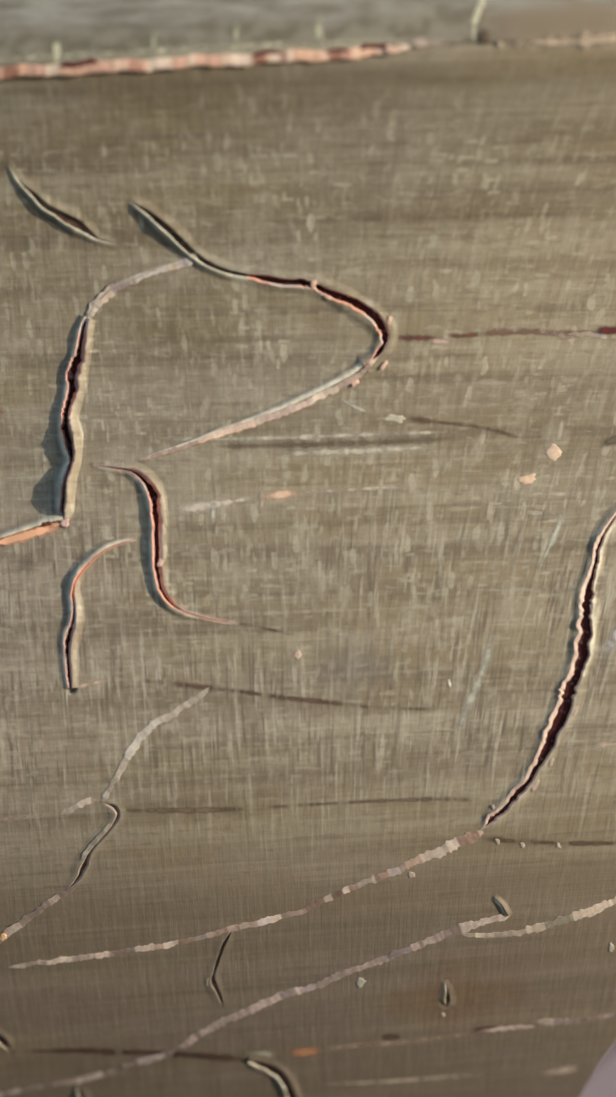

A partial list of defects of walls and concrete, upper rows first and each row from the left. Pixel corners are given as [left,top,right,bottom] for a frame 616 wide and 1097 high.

crack [0,0,616,80]
crack [0,194,616,708]
crack [0,502,616,1097]